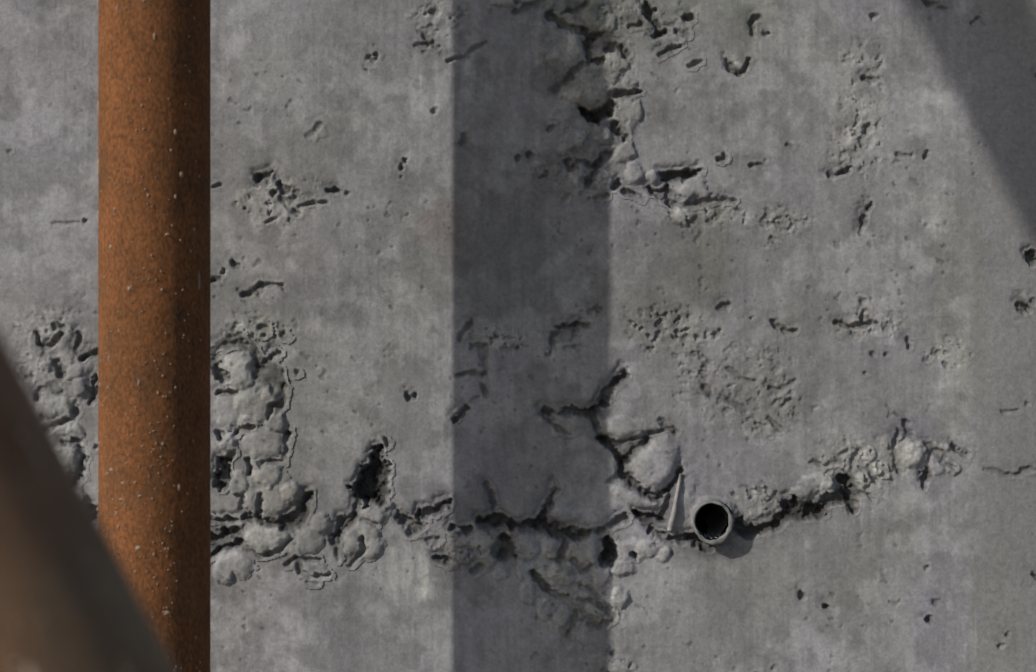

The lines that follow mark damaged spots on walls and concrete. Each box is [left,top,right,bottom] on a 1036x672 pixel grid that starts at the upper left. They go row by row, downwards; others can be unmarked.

hole [10,299,97,398]
crack [697,362,800,437]
crack [806,444,854,472]
spalling [724,472,790,520]